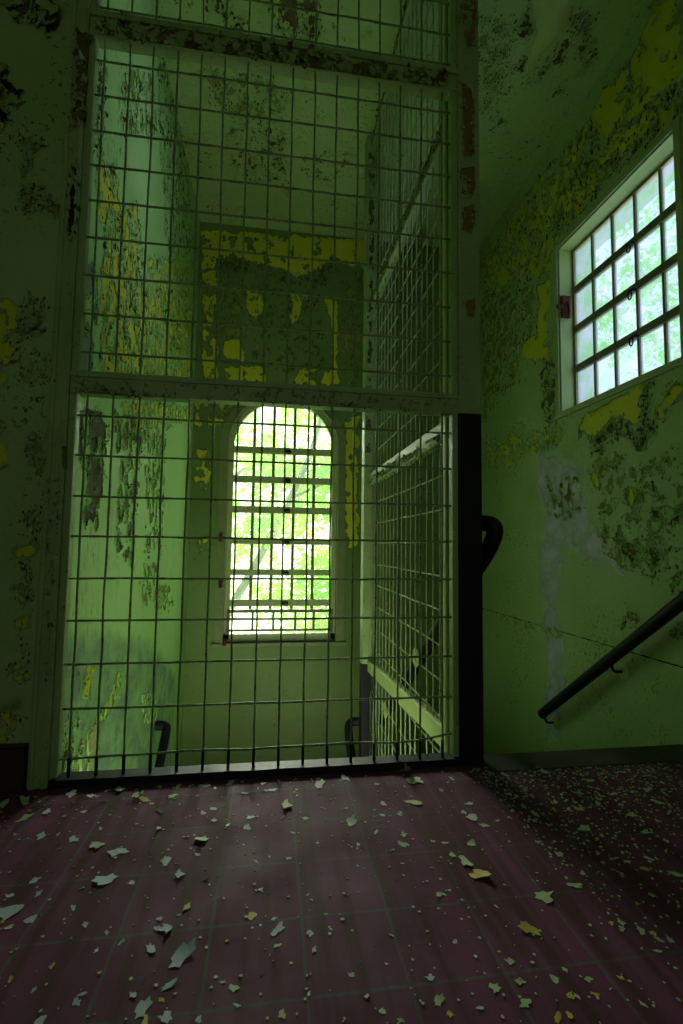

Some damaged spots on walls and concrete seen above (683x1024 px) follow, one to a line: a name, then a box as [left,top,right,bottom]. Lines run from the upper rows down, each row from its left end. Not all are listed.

peeling [68,0,600,388]
peeling [550,0,683,240]
peeling [521,276,557,427]
spalling [59,384,445,614]
peeling [544,379,683,595]
peeling [61,662,126,772]